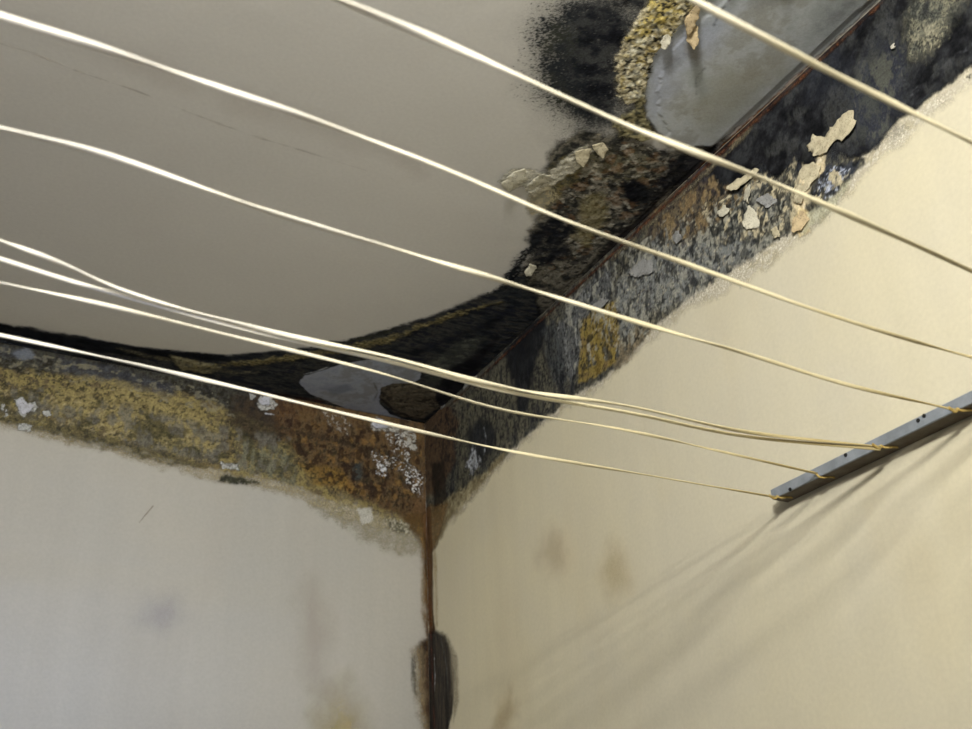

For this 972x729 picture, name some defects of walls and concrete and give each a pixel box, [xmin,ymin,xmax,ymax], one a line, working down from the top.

peeling [299,358,421,419]
damp [0,0,972,554]
corrosion [446,4,880,410]
peeling [425,0,972,547]
corrosion [404,502,458,729]